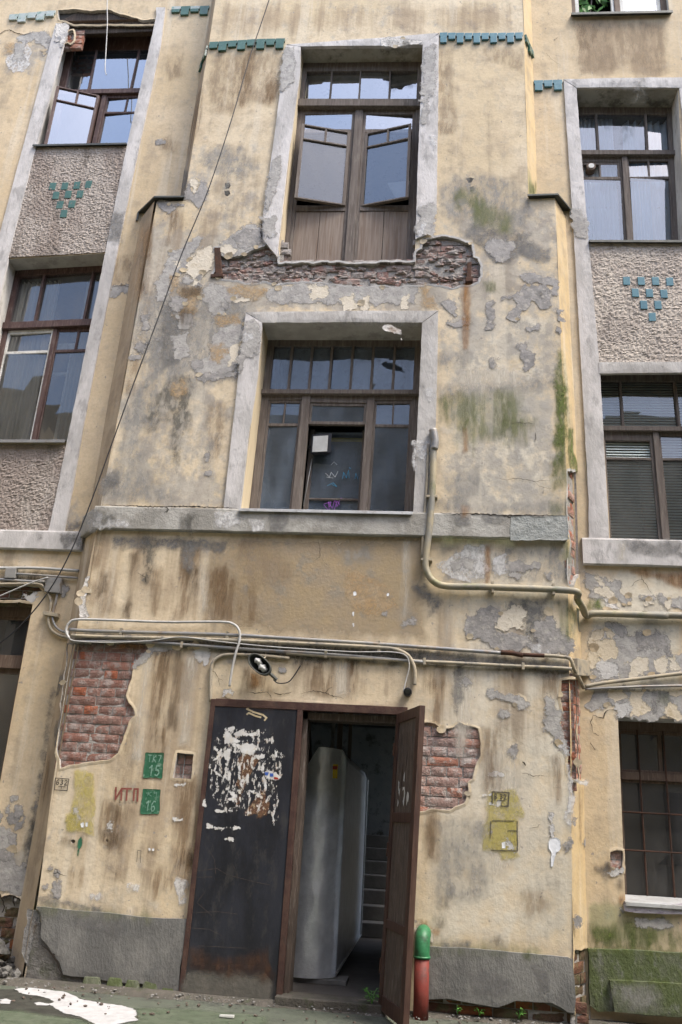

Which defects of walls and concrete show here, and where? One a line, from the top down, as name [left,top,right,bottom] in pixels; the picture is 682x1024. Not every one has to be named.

peeling [279,46,296,91]
peeling [381,36,438,146]
flaking render [141,155,483,383]
peeling [484,272,566,372]
leakage [60,511,226,582]
leakage [214,512,288,531]
flaking render [464,468,682,791]
flaking render [54,639,211,771]
flaking render [420,719,484,815]
flaking render [0,795,27,961]